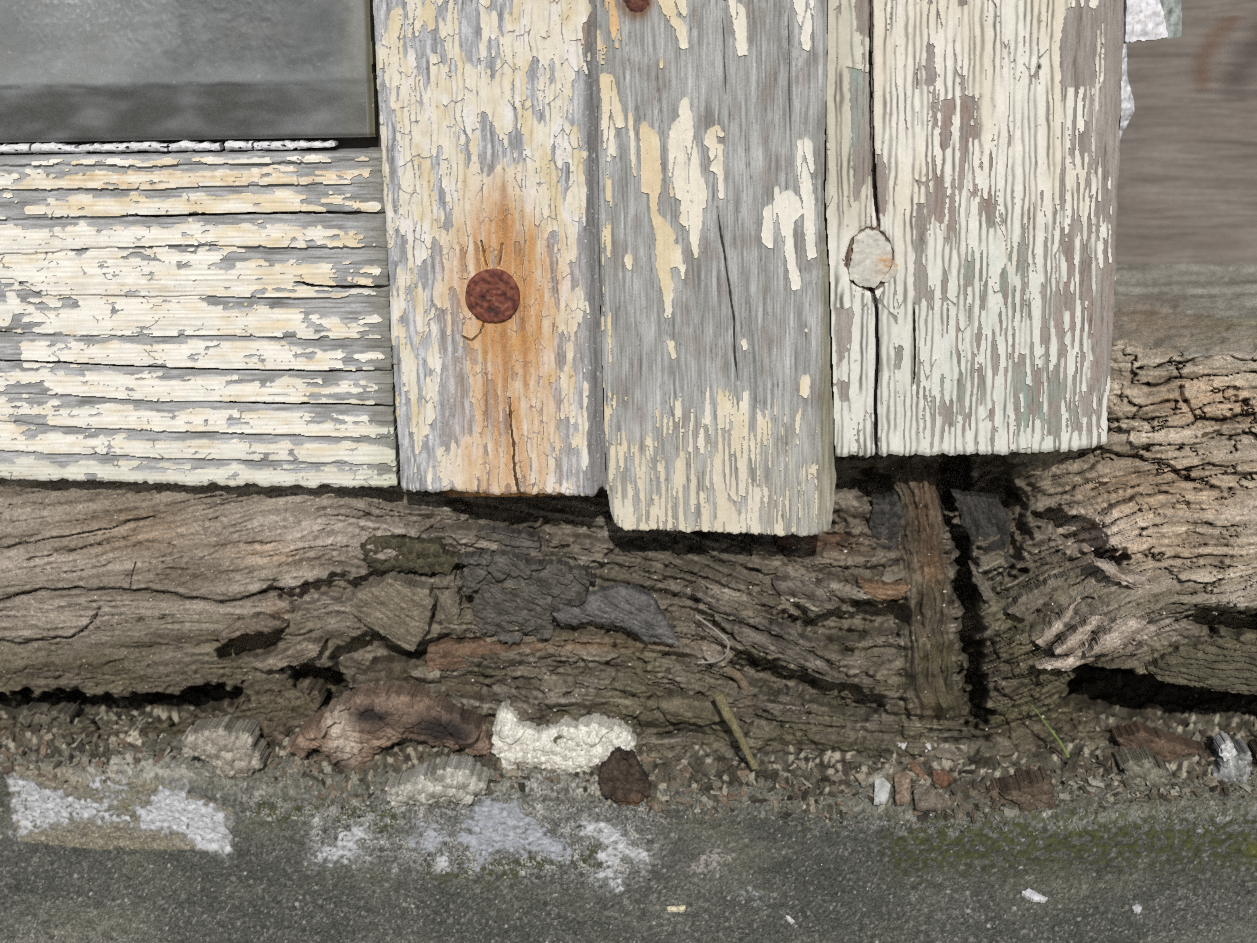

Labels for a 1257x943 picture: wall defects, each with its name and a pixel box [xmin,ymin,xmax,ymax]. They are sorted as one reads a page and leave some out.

peeling [0,0,818,536]
peeling [761,0,1116,458]
peeling [1124,0,1168,42]